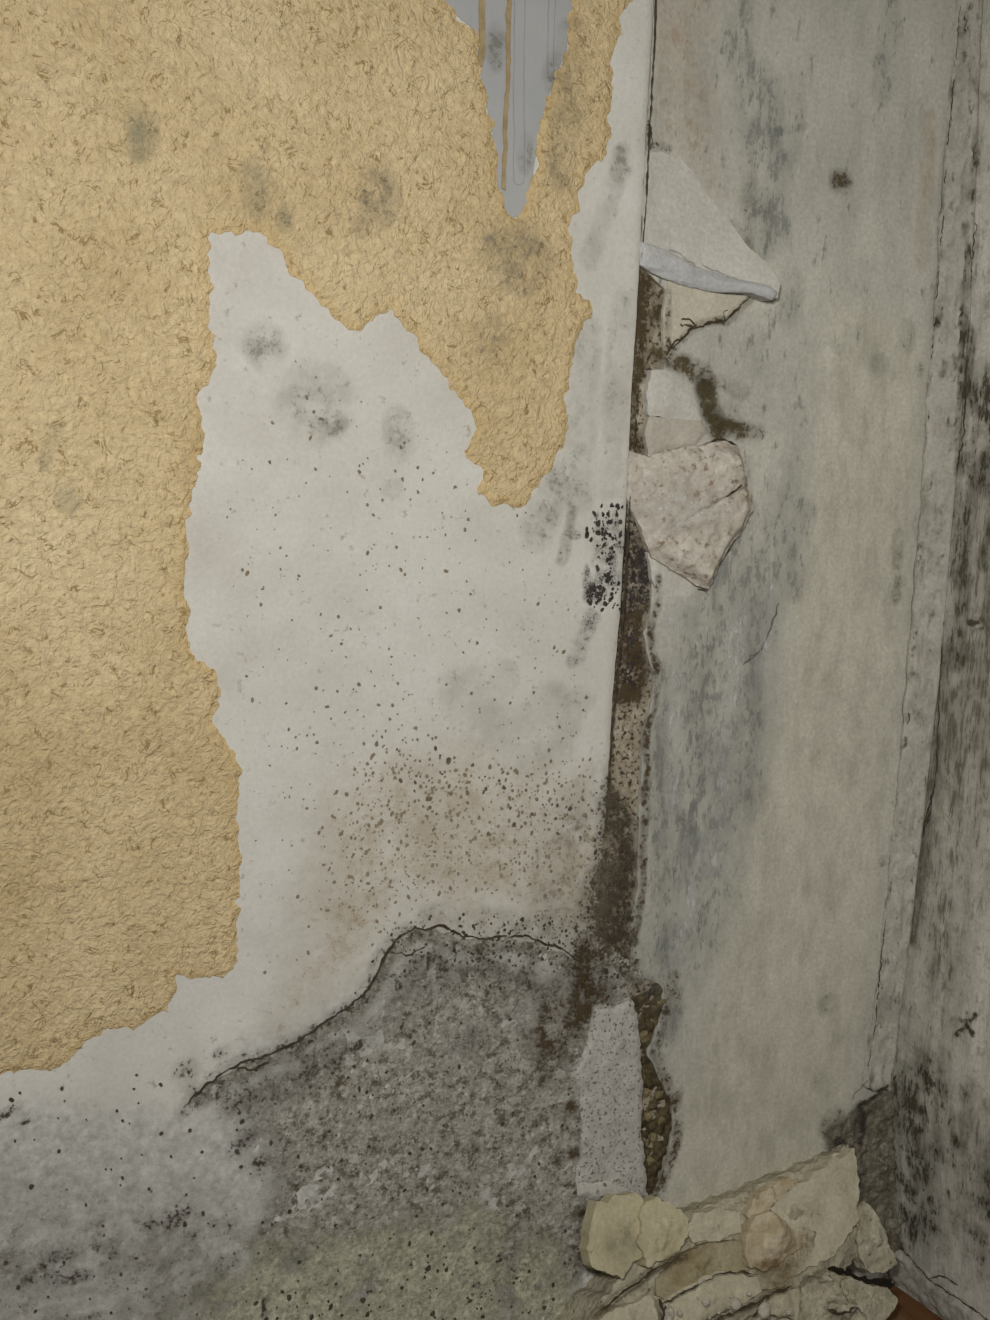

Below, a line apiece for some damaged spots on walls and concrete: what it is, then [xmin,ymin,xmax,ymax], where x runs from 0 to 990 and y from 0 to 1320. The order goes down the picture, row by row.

peeling [445,0,573,217]
peeling [639,152,780,358]
peeling [626,416,753,606]
water stain [909,244,990,1012]
water stain [269,488,815,1196]
water stain [4,1246,95,1313]
water stain [211,1022,388,1214]
water stain [143,1175,589,1320]
crack [179,924,578,1115]
water stain [557,1148,586,1217]
water stain [892,1056,990,1266]
water stain [954,1012,977,1037]